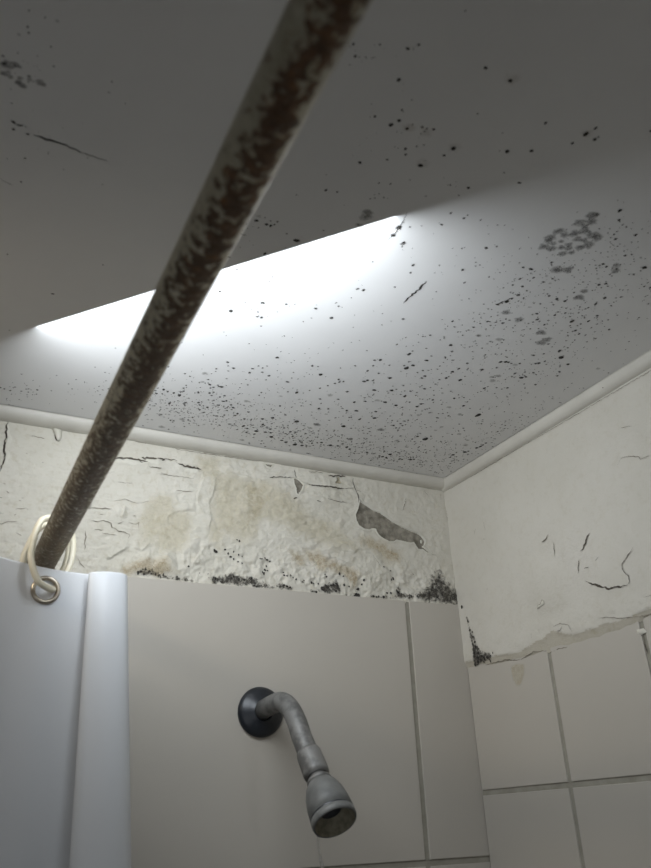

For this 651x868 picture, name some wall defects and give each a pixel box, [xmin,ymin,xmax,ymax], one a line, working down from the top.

leakage [142,200,651,474]
crack [0,422,45,536]
crack [78,441,259,568]
spalling [263,462,434,555]
leakage [137,567,200,581]
leakage [212,557,365,597]
leakage [371,566,493,666]
crack [487,623,573,665]
crack [542,534,633,590]